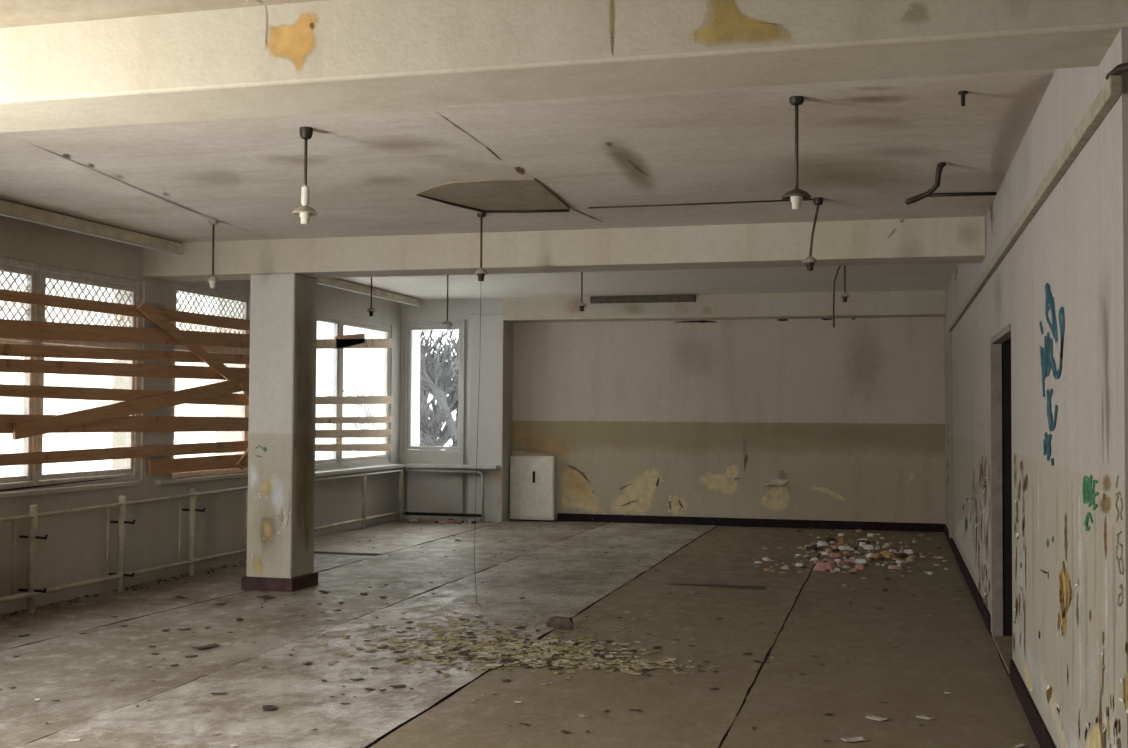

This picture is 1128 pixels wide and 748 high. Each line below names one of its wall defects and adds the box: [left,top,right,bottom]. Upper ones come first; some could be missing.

spalling [559,463,689,516]
flaking render [955,456,991,609]
peeling [1013,453,1128,748]